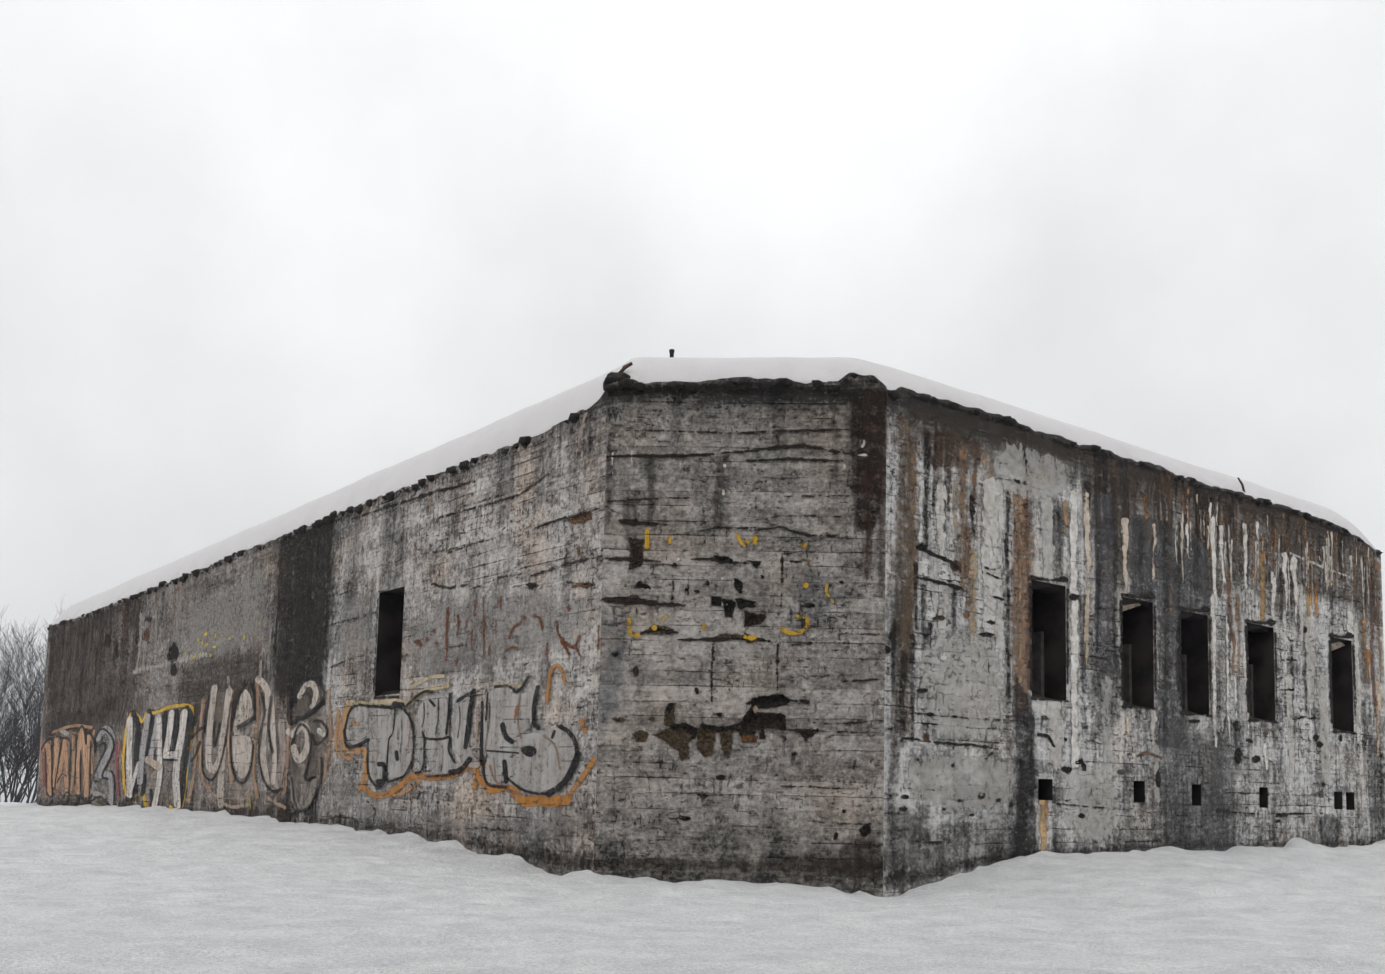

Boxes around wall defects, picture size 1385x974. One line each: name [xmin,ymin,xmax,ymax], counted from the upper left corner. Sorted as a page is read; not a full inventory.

spalling [568,512,592,524]
spalling [604,539,651,605]
spalling [644,624,675,635]
spalling [685,578,766,643]
leakage [344,379,1385,887]
corrosion [891,412,993,755]
corrosion [1011,473,1050,717]
corrosion [1181,489,1382,756]
leakage [43,520,337,824]
spalling [612,693,820,761]
spalling [859,825,871,837]
corrosion [1039,800,1048,851]